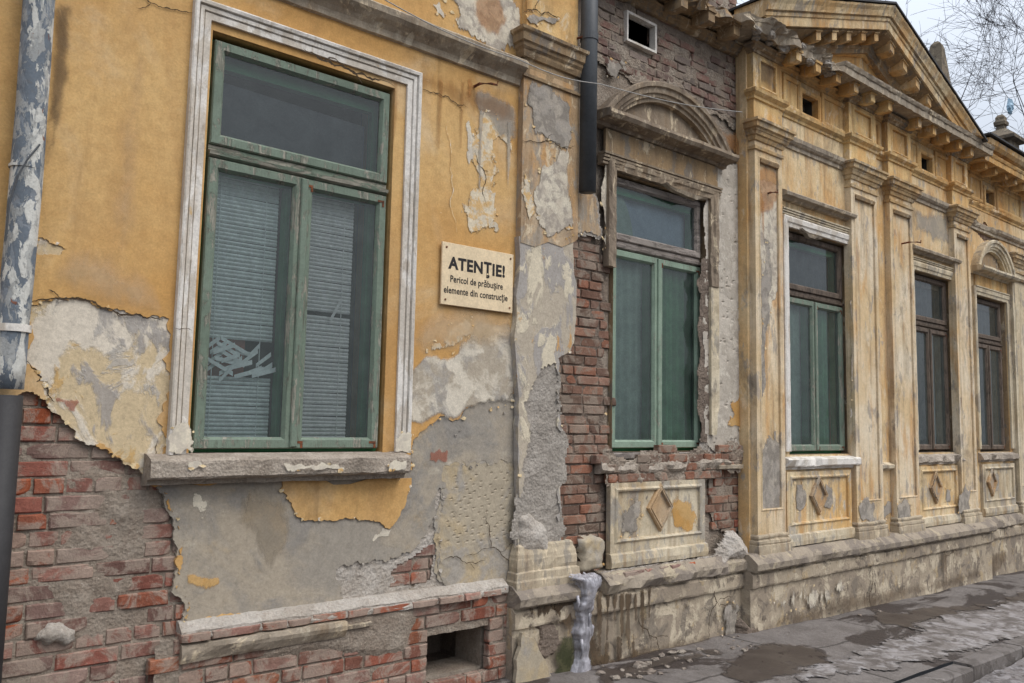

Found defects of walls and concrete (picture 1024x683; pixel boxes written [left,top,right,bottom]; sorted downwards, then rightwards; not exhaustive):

crack [136,0,193,13]
peeling [433,0,560,52]
crack [32,290,189,330]
spalling [1,81,744,683]